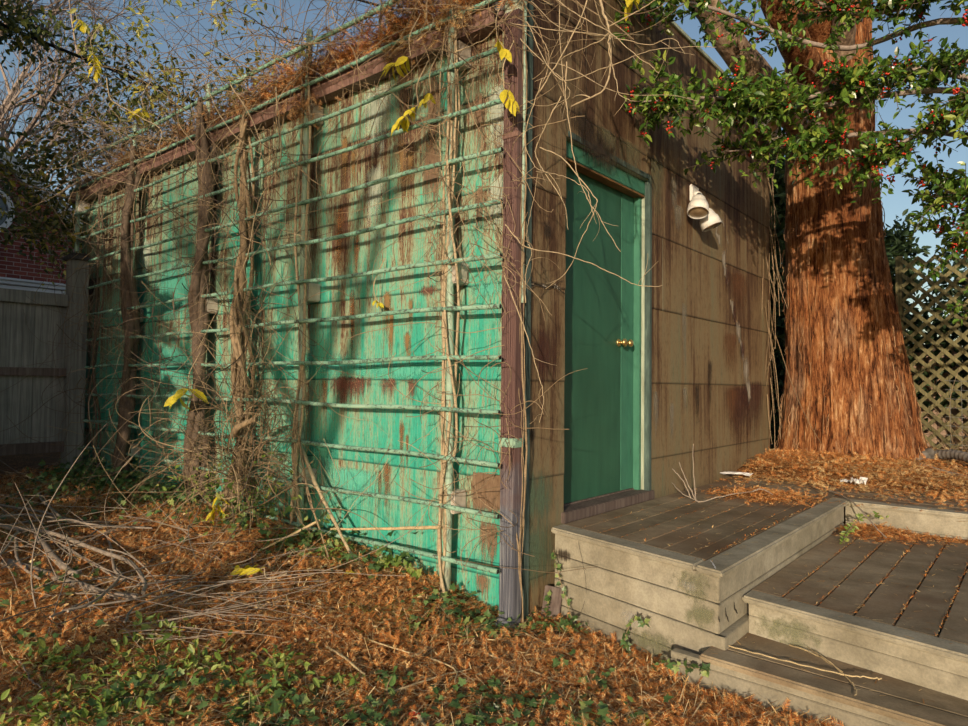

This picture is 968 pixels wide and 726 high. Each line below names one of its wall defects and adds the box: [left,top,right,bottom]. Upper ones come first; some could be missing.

rust [349,235,359,347]
rust [399,424,408,459]
rust [378,464,390,506]